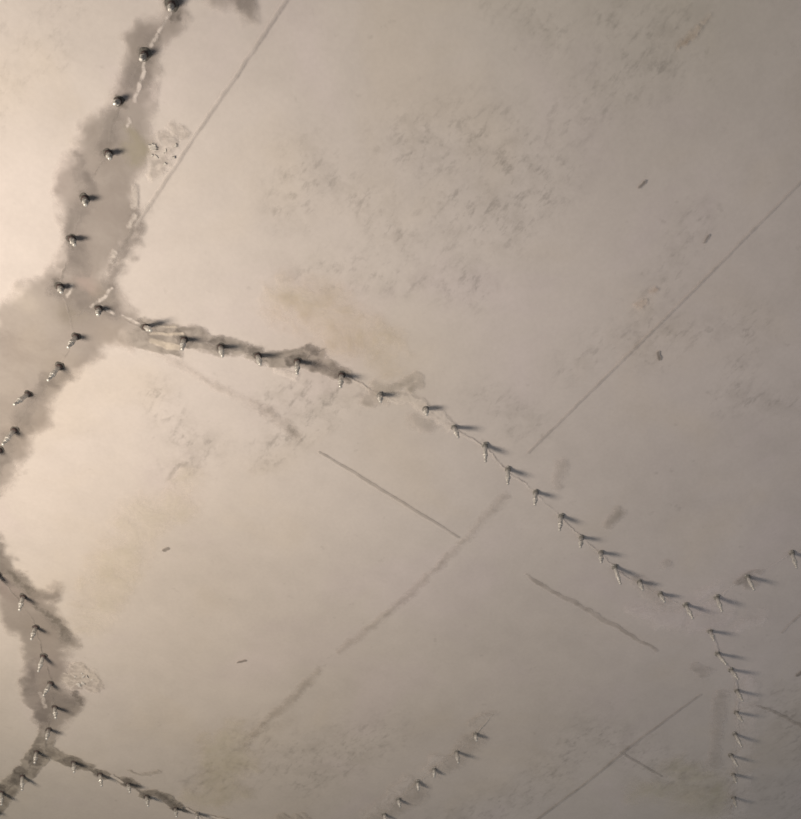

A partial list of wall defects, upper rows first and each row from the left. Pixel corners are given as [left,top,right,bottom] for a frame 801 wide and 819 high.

damp [0,0,394,487]
damp [362,373,453,433]
damp [0,544,225,819]